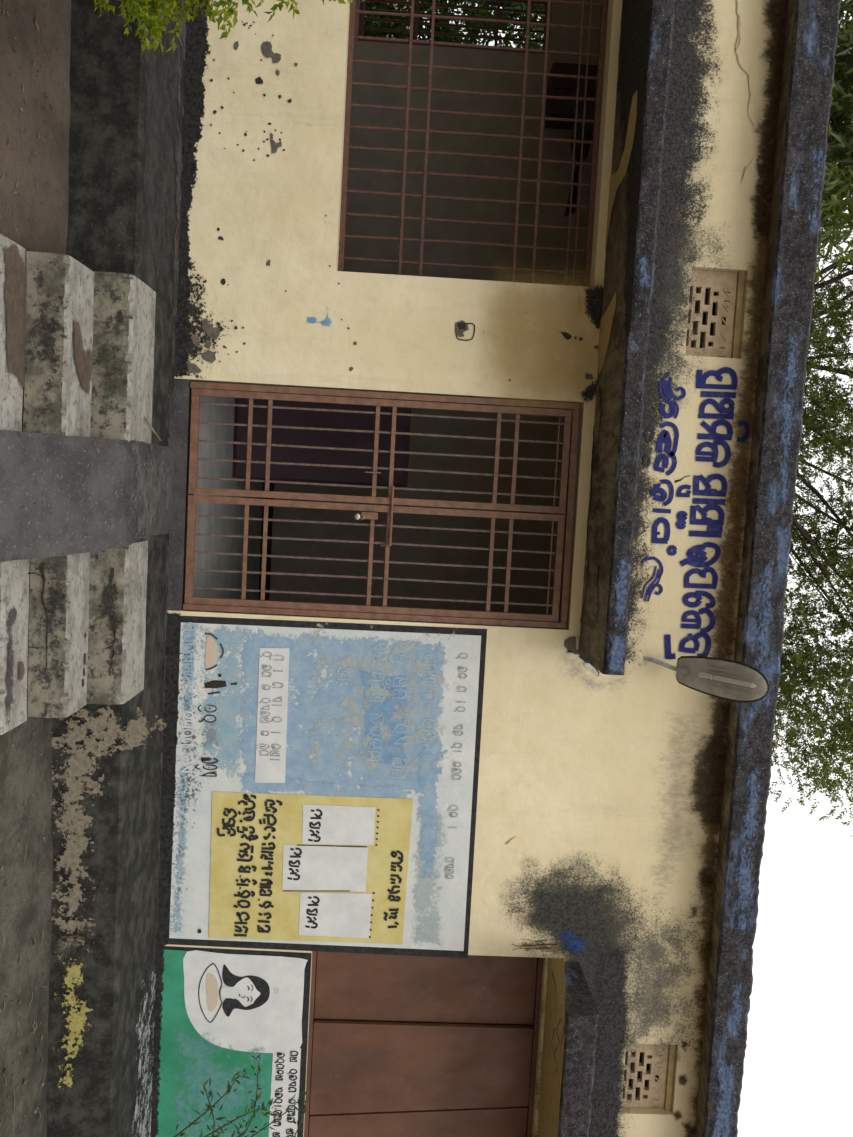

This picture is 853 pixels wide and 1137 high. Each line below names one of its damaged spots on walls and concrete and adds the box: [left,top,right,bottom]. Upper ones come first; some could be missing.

damp [174,0,211,378]
peeling [242,21,281,76]
damp [616,0,657,351]
crack [735,0,754,125]
damp [753,0,788,237]
damp [36,301,69,381]
damp [507,285,604,383]
damp [626,0,729,666]
damp [713,459,748,660]
damp [691,700,730,823]
damp [500,855,715,1137]